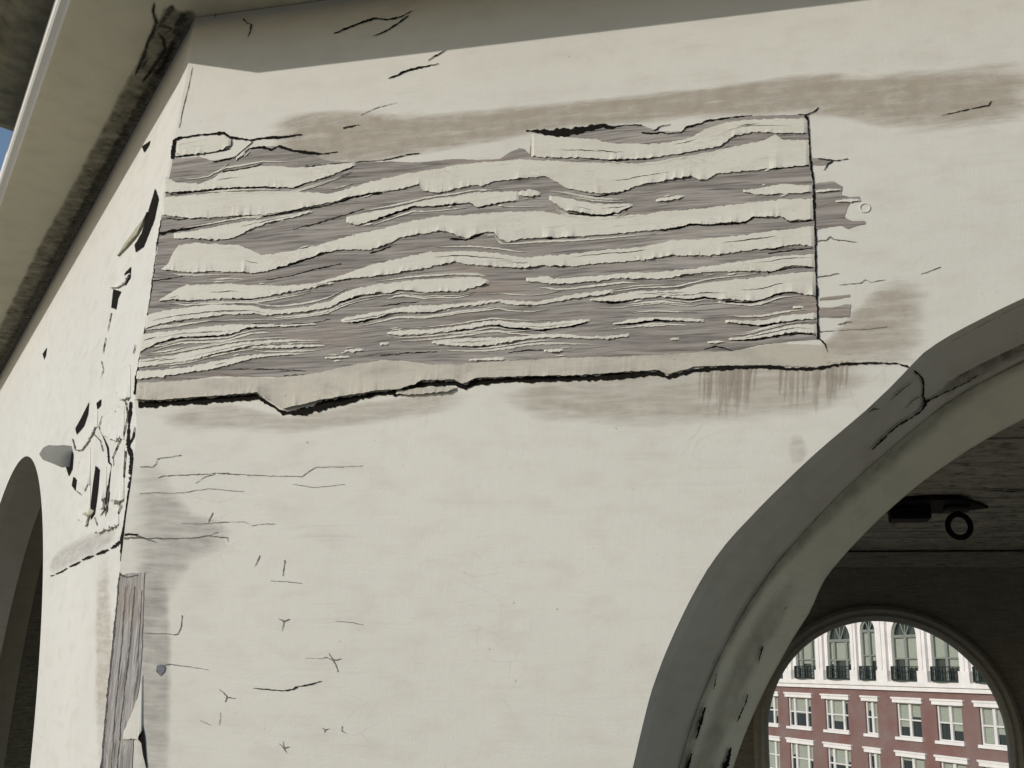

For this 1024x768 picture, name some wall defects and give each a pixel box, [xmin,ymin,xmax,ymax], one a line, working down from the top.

damp [0,3,192,373]
crack [334,11,411,36]
damp [288,75,1023,159]
peeling [72,114,866,534]
crack [50,107,978,577]
peeling [100,572,145,768]
crack [163,654,341,725]